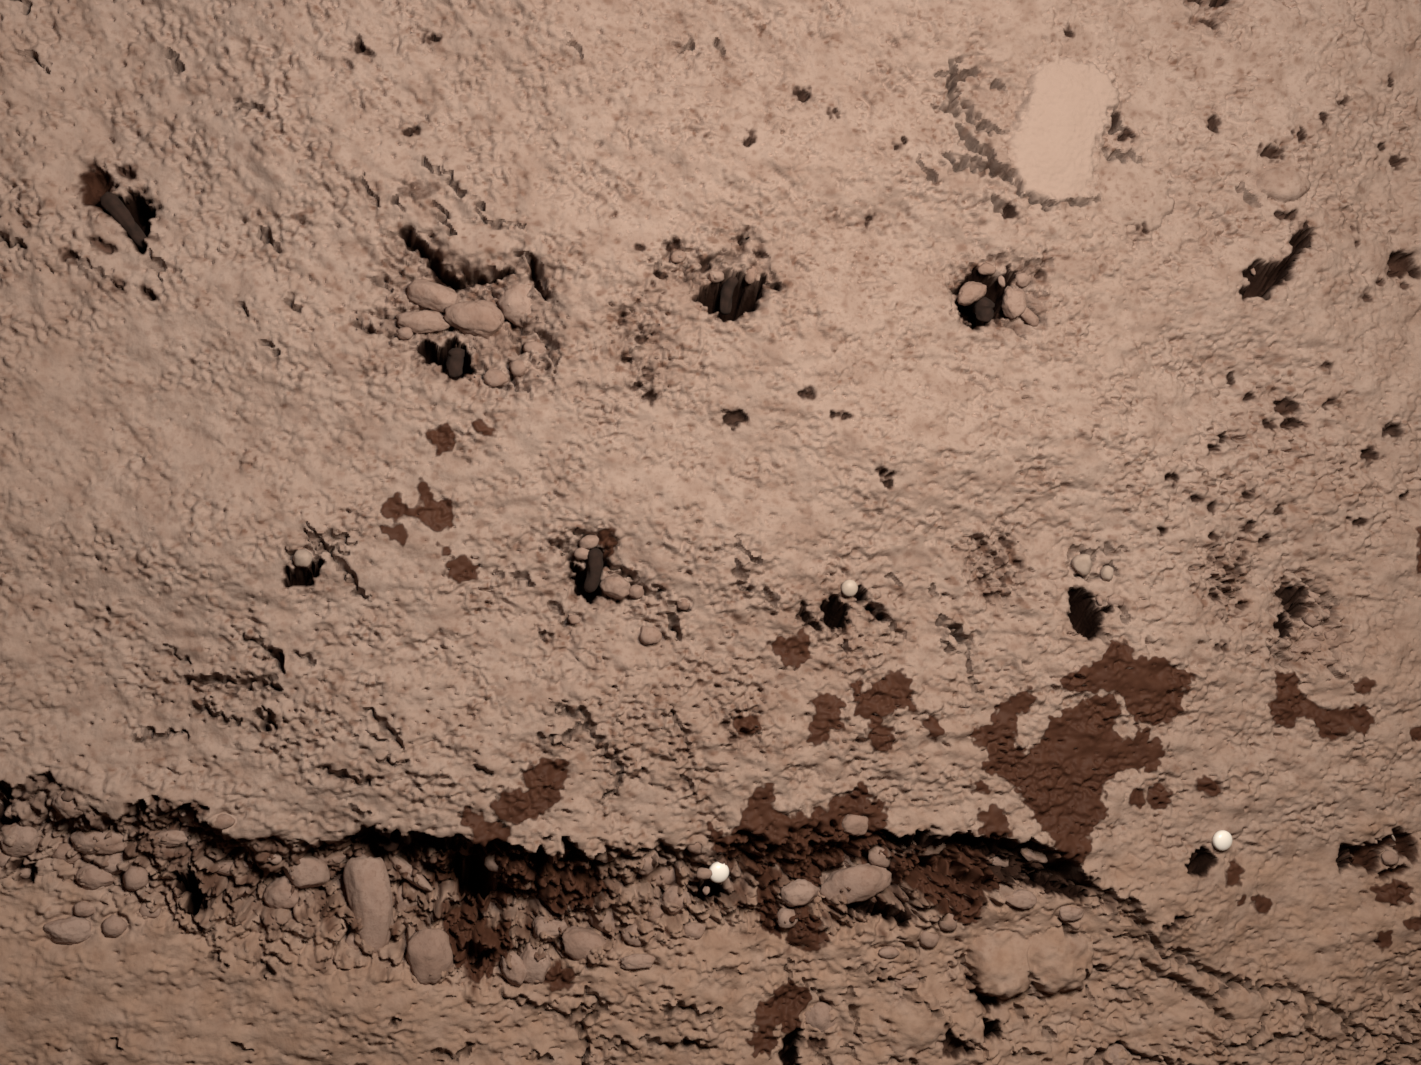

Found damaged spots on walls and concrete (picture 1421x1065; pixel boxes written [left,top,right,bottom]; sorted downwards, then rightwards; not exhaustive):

hole [63,158,168,301]
spalling [347,225,566,404]
hole [635,225,786,326]
hole [942,250,1056,341]
spalling [538,521,692,644]
spalling [0,772,1146,1065]
crack [230,1041,255,1055]
crack [388,1016,402,1029]
crack [430,1041,476,1065]
crack [498,965,744,1065]
crack [845,942,952,1023]
crack [1061,913,1421,1063]